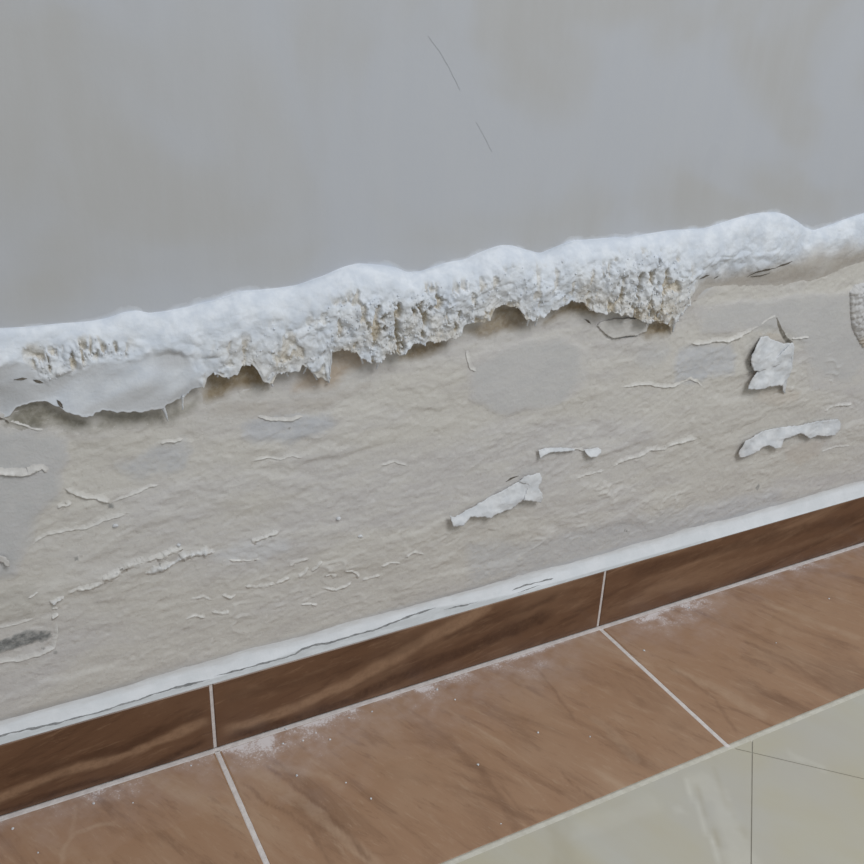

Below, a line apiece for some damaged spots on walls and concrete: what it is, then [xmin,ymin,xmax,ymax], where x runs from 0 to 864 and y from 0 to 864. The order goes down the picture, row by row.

water stain [0,208,864,435]
peeling [690,315,809,393]
peeling [0,464,49,477]
peeling [538,447,601,459]
peeling [739,402,853,458]
peeling [450,473,543,527]